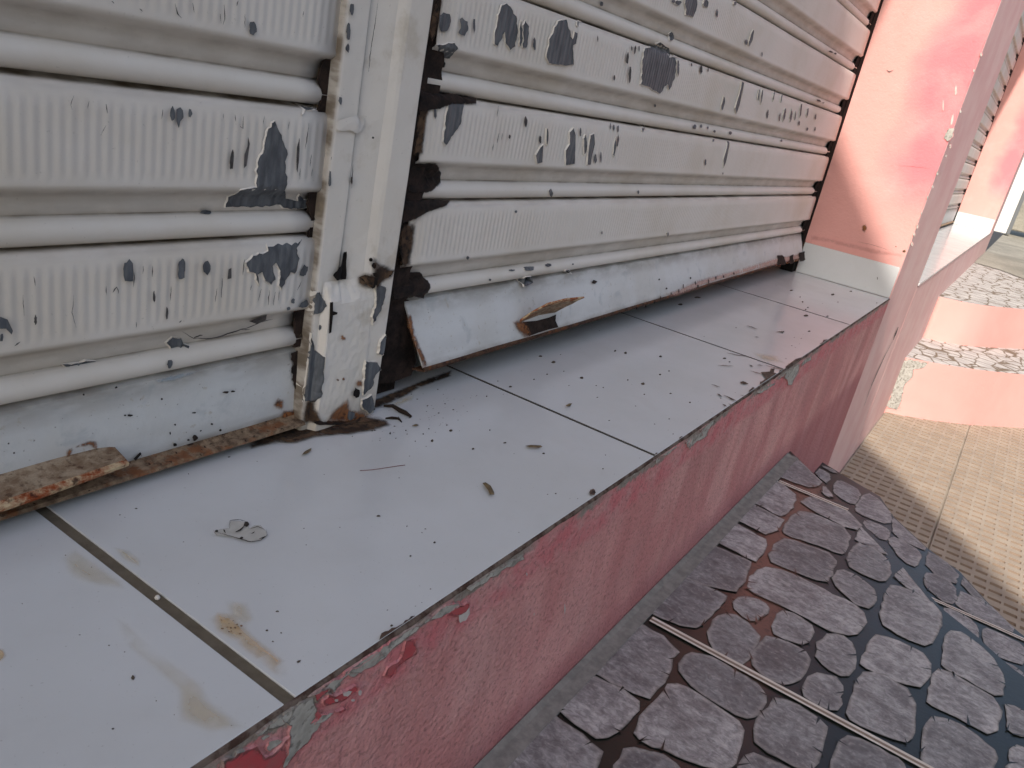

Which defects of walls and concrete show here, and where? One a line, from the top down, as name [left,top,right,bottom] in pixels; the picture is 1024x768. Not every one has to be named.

peeling [493,3,581,66]
peeling [640,31,679,107]
peeling [224,120,307,209]
peeling [244,239,308,290]
peeling [287,290,327,402]
peeling [348,334,386,420]
peeling [370,285,386,325]
rust [515,321,529,336]
spalling [220,555,524,768]